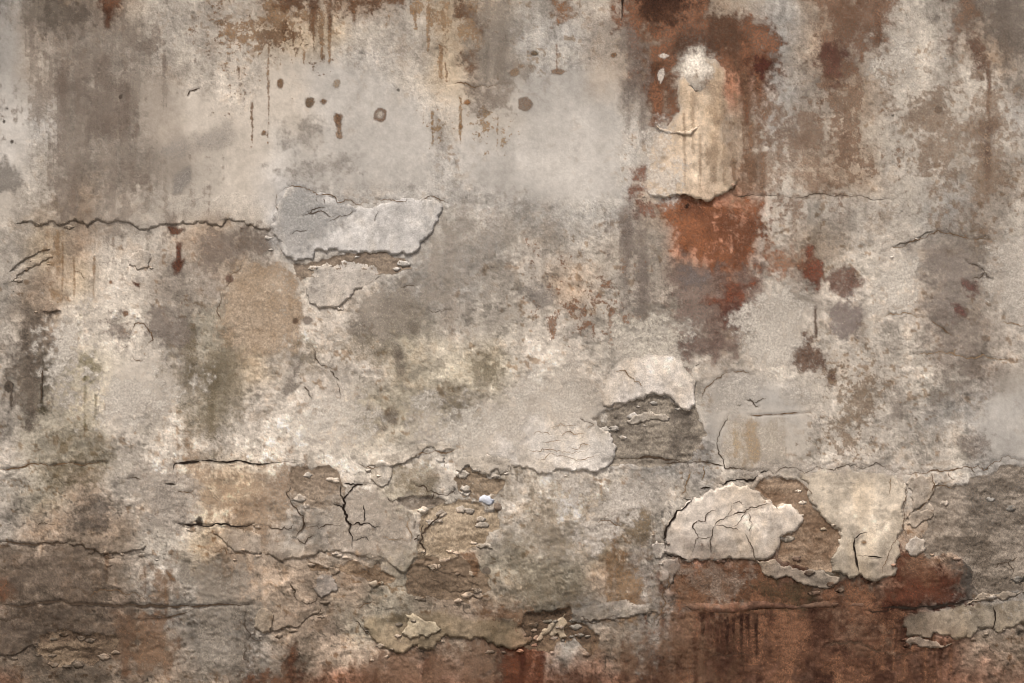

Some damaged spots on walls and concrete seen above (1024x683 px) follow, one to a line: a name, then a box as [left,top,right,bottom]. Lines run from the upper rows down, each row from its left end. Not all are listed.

leakage [0,0,167,243]
corrosion [188,0,520,156]
peeling [642,57,737,202]
corrosion [610,0,1024,328]
leakage [1,298,217,436]
peeling [8,187,443,311]
corrosion [523,253,641,349]
crack [882,230,990,279]
crack [131,460,481,596]
peeling [179,352,707,662]
corrosion [600,509,974,683]
spalling [651,465,1024,648]